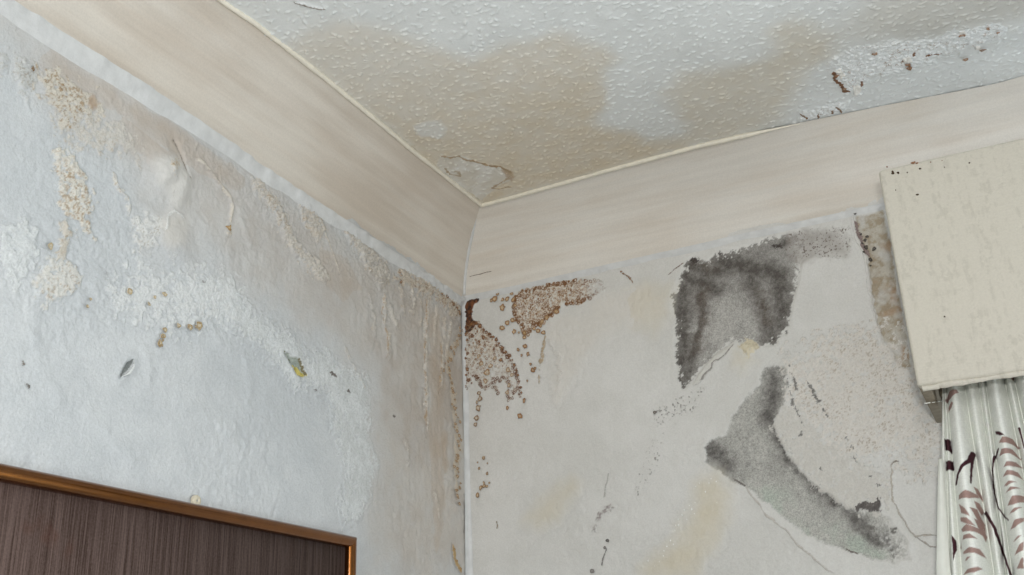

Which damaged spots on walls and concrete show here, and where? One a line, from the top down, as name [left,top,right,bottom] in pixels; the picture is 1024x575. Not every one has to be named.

water stain [279,0,1024,203]
peeling [796,23,1008,123]
water stain [0,14,682,575]